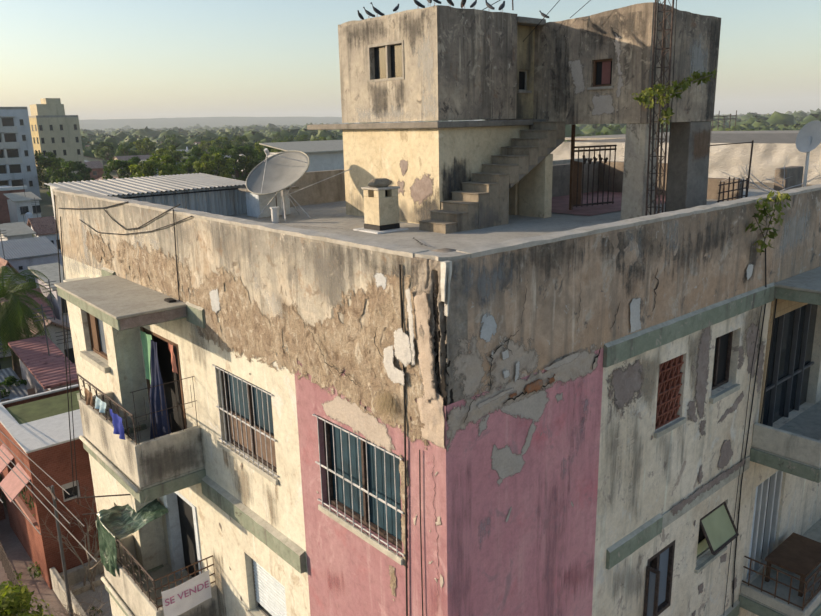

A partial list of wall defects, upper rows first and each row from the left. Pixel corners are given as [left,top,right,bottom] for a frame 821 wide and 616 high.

leakage [359,81,403,122]
peeling [397,160,434,205]
flaking render [630,298,641,333]
flaking render [85,230,598,601]
peeling [607,359,644,416]
peeling [687,327,712,440]
peeling [671,440,746,516]